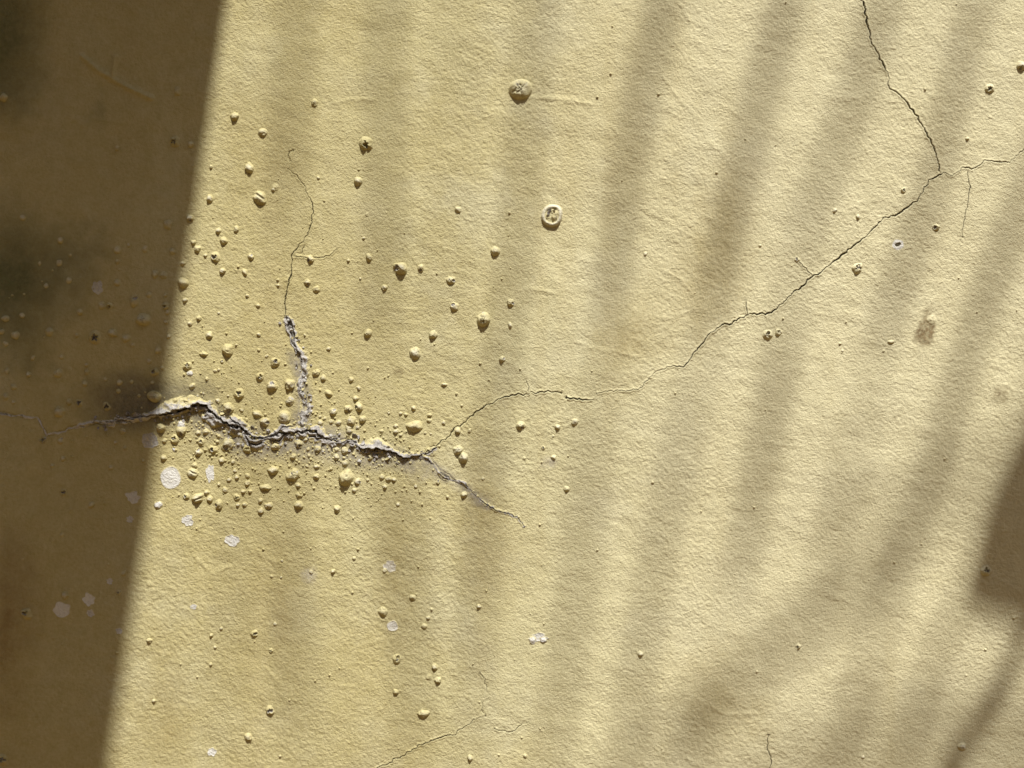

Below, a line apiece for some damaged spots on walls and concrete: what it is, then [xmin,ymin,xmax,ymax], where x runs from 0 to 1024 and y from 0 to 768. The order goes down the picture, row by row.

crack [0,0,1024,528]